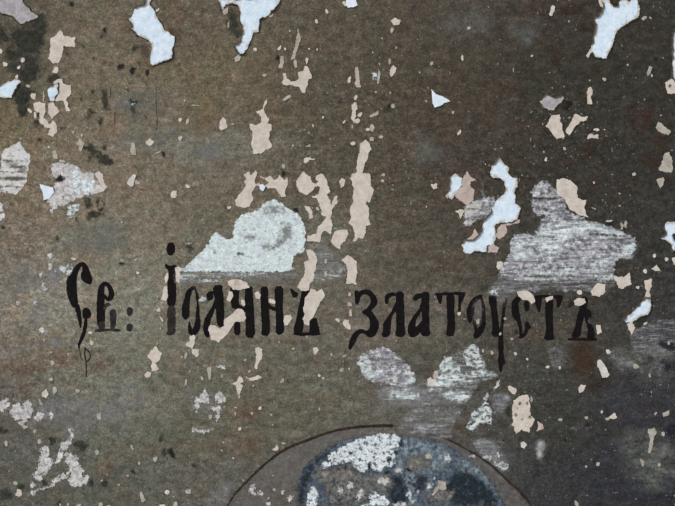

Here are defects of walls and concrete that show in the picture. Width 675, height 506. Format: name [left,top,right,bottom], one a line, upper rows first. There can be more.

peeling [127,0,176,66]
peeling [219,0,281,62]
peeling [586,0,652,60]
peeling [250,99,272,154]
peeling [40,175,65,200]
peeling [296,95,383,249]
peeling [446,156,522,254]
flaking render [556,178,596,217]
peeling [591,283,606,297]
peeling [508,386,544,434]